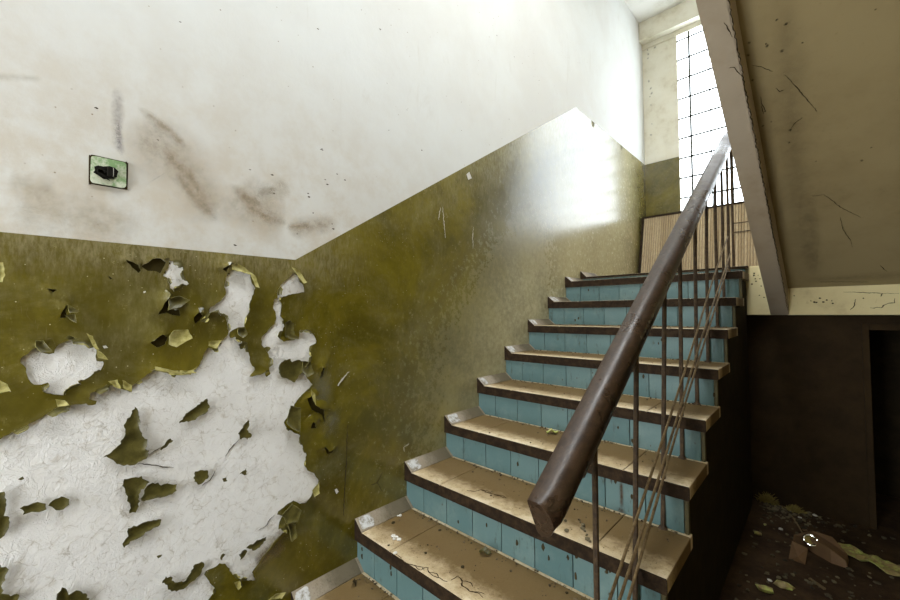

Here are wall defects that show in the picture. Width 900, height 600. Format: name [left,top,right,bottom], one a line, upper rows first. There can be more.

crack [724,0,816,308]
peeling [0,260,320,600]
crack [396,554,484,594]